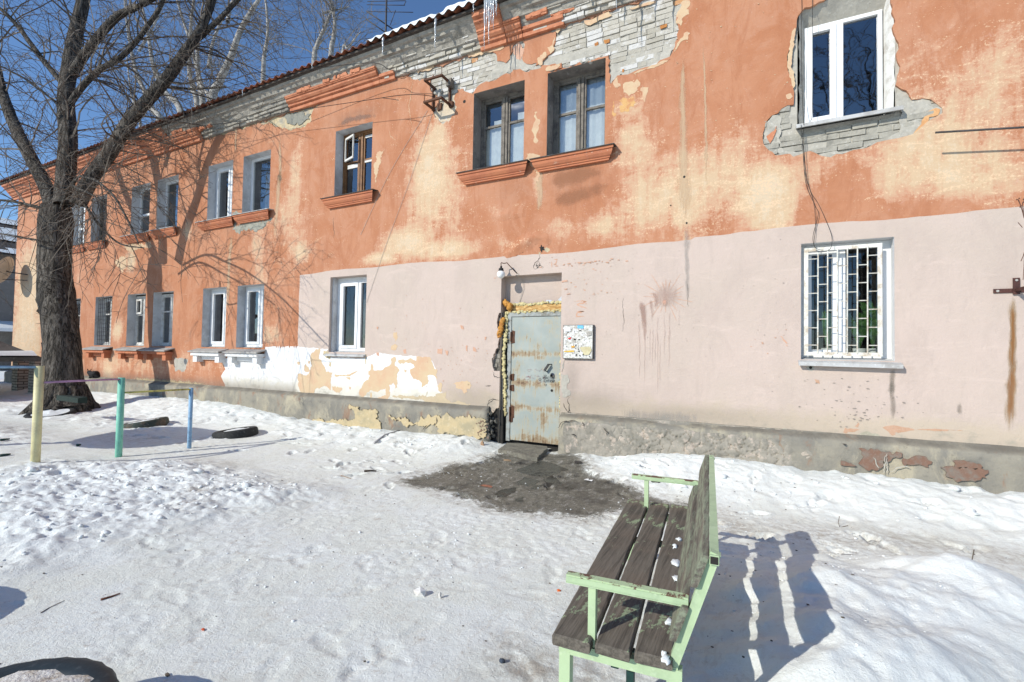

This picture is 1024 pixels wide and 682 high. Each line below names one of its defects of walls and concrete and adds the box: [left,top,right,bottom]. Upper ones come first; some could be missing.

flaking render [402,0,697,126]
flaking render [763,27,942,157]
peeling [297,330,497,441]
peeling [824,378,989,482]
corrosion [1007,302,1016,423]